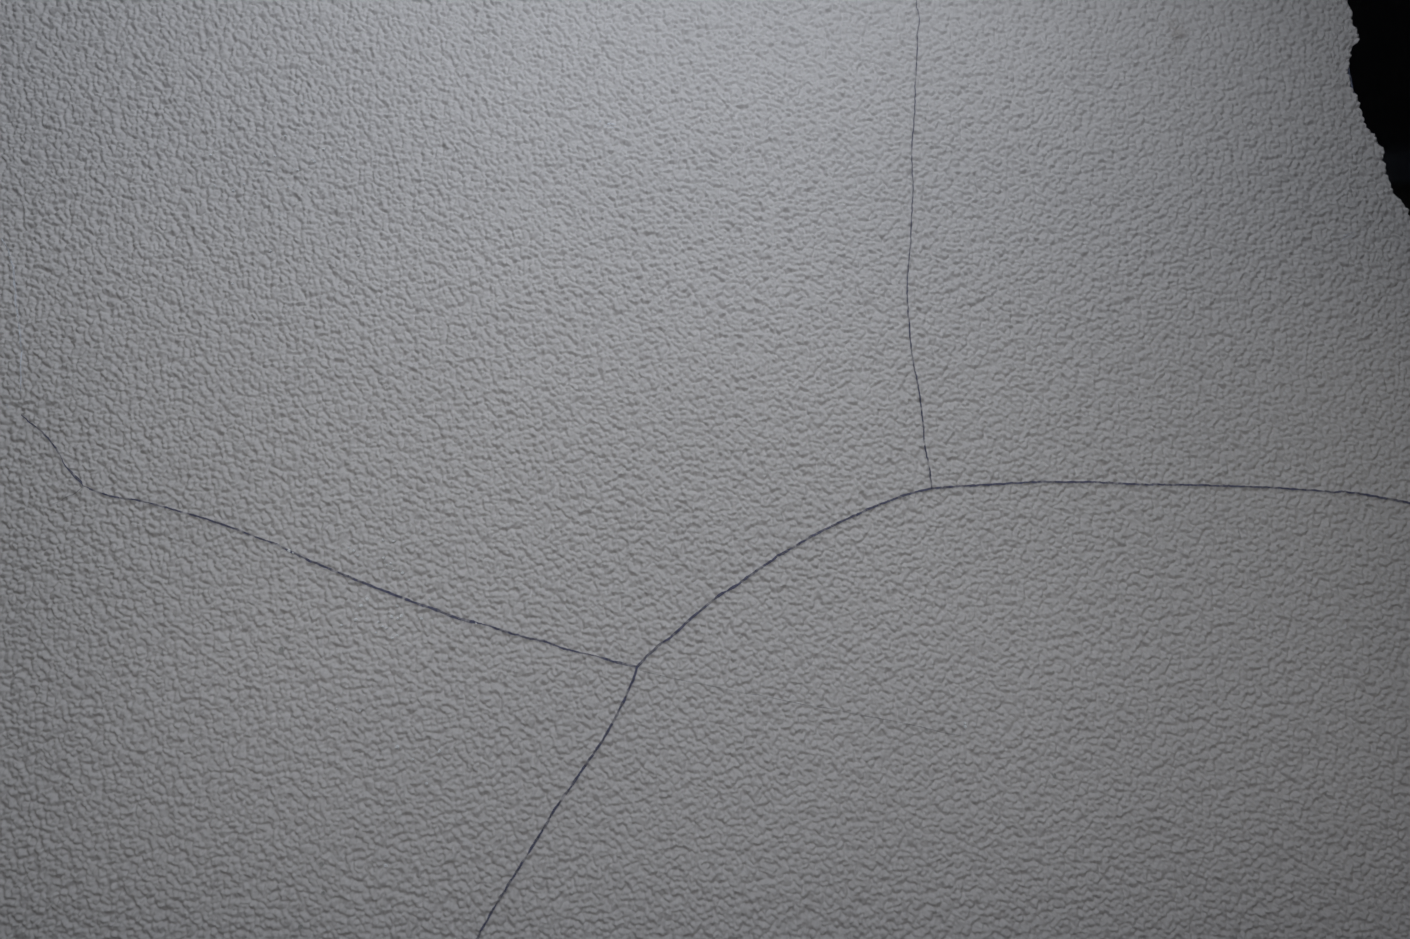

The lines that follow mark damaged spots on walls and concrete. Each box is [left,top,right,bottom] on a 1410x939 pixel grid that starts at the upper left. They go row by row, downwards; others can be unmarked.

crack [906,2,920,352]
crack [21,362,1410,939]